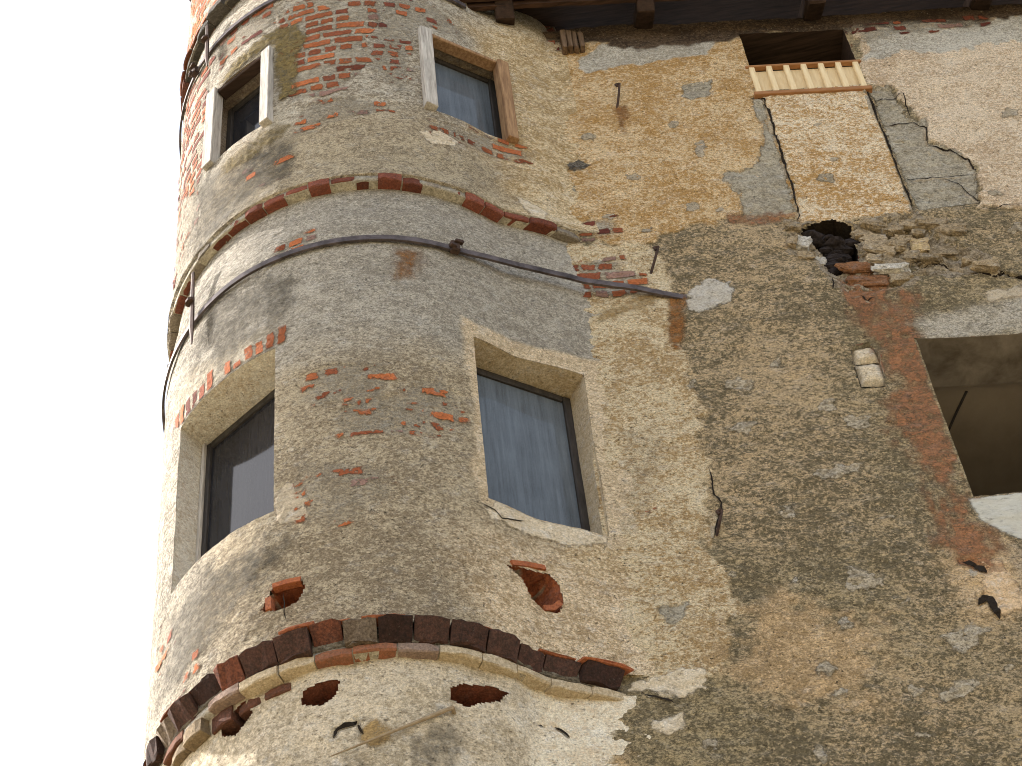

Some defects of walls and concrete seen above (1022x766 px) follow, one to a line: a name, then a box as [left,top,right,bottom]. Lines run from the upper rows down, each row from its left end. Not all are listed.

spalling [1001,107,1018,118]
spalling [172,0,457,288]
crack [863,89,1008,213]
spalling [723,85,1002,298]
crack [973,270,1022,280]
spalling [986,286,1022,302]
corrosion [842,271,1003,569]
crack [948,391,968,431]
crack [708,467,722,538]
spalling [301,680,340,706]
spalling [450,683,509,707]